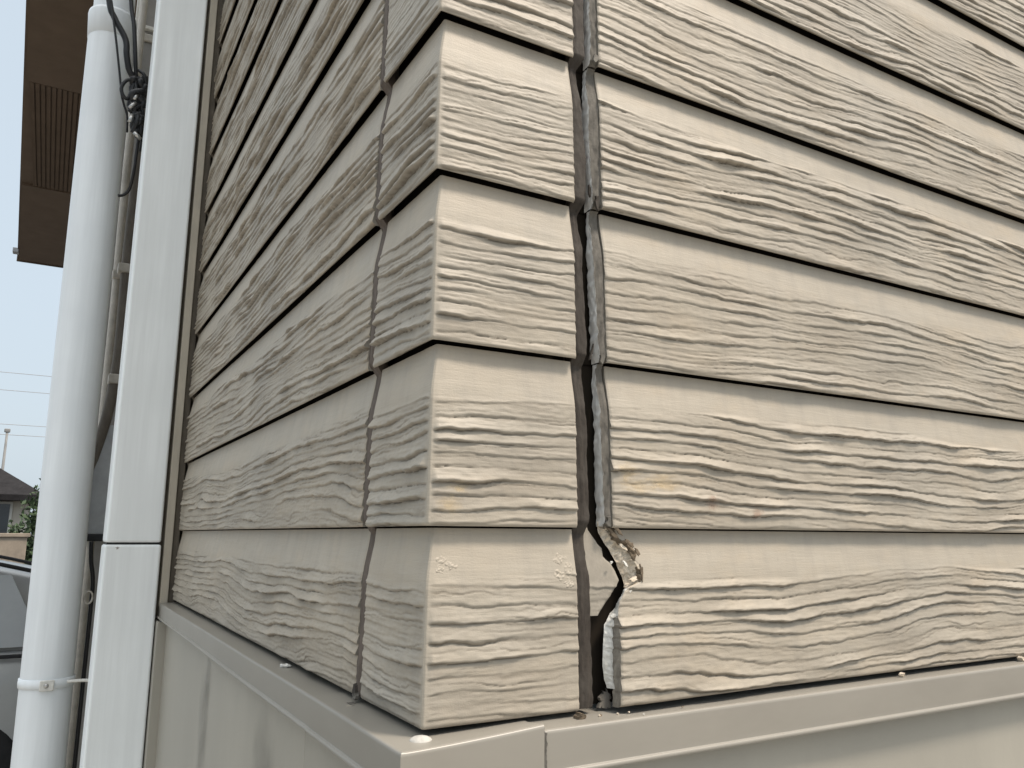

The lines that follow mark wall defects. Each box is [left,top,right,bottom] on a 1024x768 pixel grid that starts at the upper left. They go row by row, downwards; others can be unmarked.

crack [575,0,645,717]